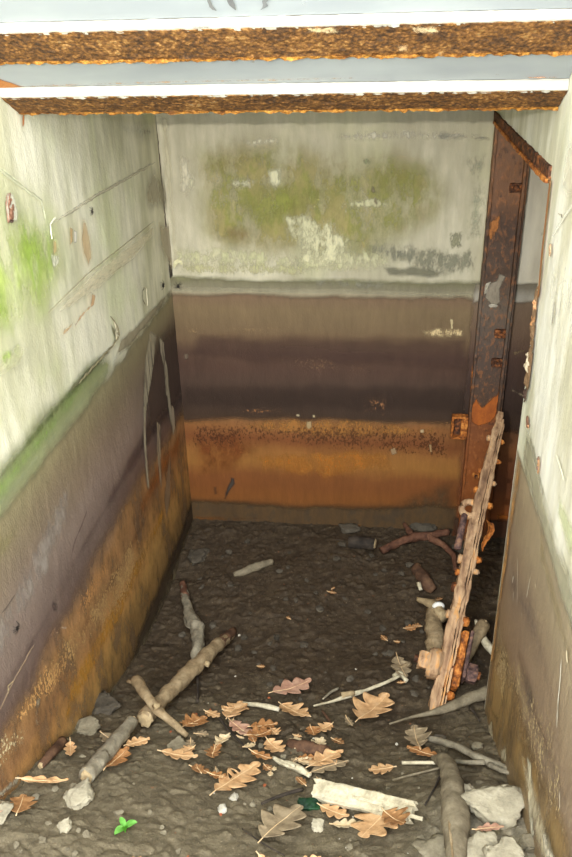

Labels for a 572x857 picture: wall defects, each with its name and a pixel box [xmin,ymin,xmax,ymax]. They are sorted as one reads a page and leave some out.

rust [19,106,558,126]
rust [489,216,500,239]
rust [537,180,552,297]
rust [471,395,498,426]
rust [0,415,465,800]
rust [482,431,567,857]